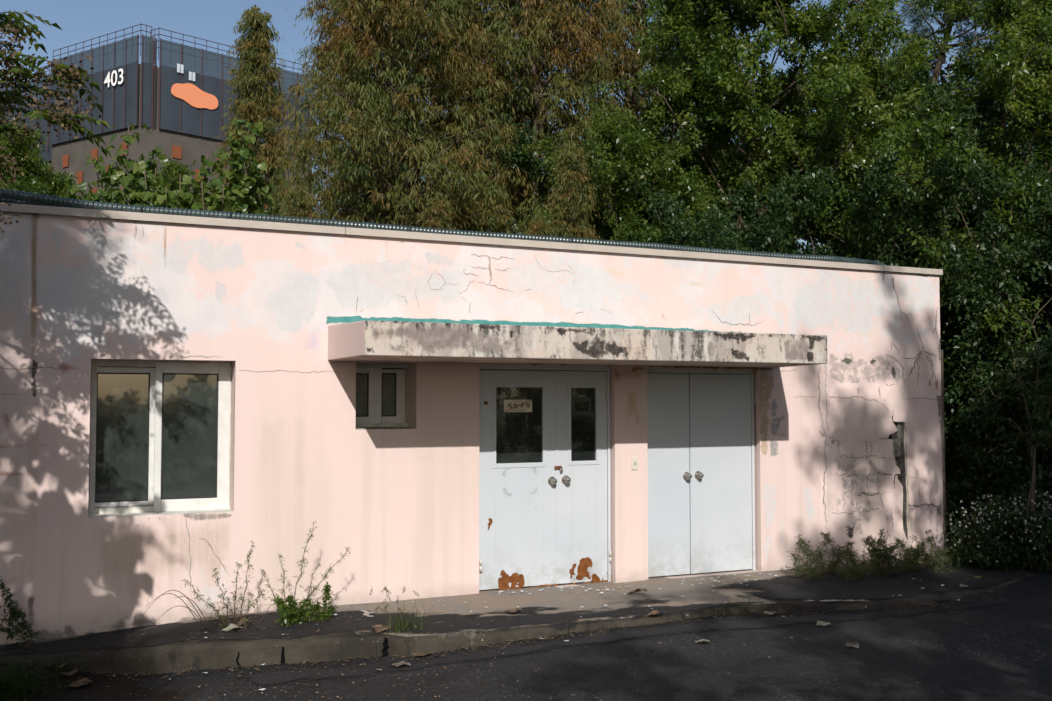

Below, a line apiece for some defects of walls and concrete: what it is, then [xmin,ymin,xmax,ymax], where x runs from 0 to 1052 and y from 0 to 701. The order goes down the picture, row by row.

crack [398,254,576,314]
mould [364,321,514,355]
water stain [551,327,643,381]
flaking render [829,353,901,383]
flaking render [758,373,785,456]
crack [711,270,943,545]
corrosion [494,557,612,591]